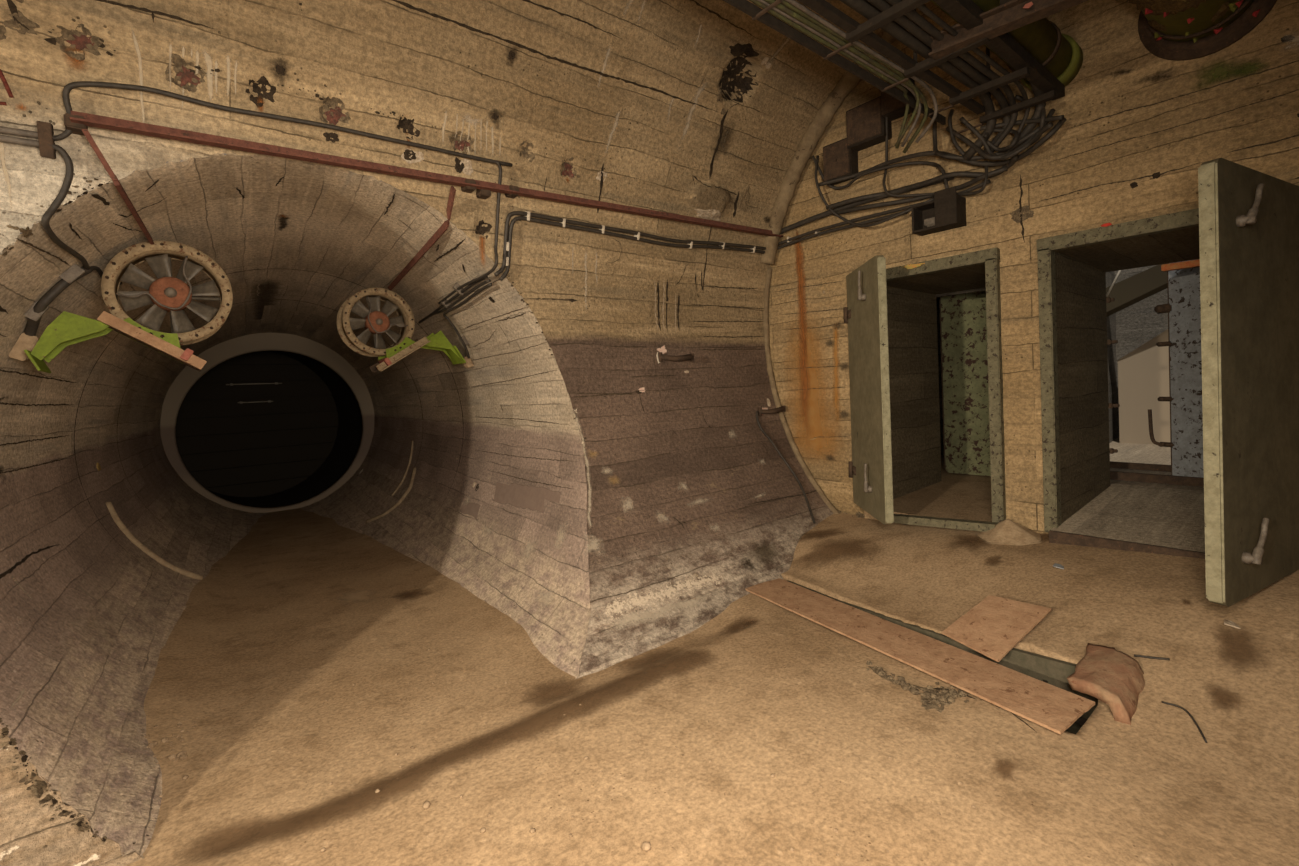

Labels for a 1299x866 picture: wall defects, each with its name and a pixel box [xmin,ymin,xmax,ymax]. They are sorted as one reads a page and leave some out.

crack [392,0,761,177]
spalling [717,43,771,114]
spalling [0,176,110,258]
crack [92,180,167,232]
crack [596,163,607,213]
crack [384,194,676,425]
crack [676,185,848,391]
corrosion [796,234,838,453]
damp [605,572,726,624]
damp [728,620,756,632]
spalling [0,718,107,842]
damp [194,652,708,855]